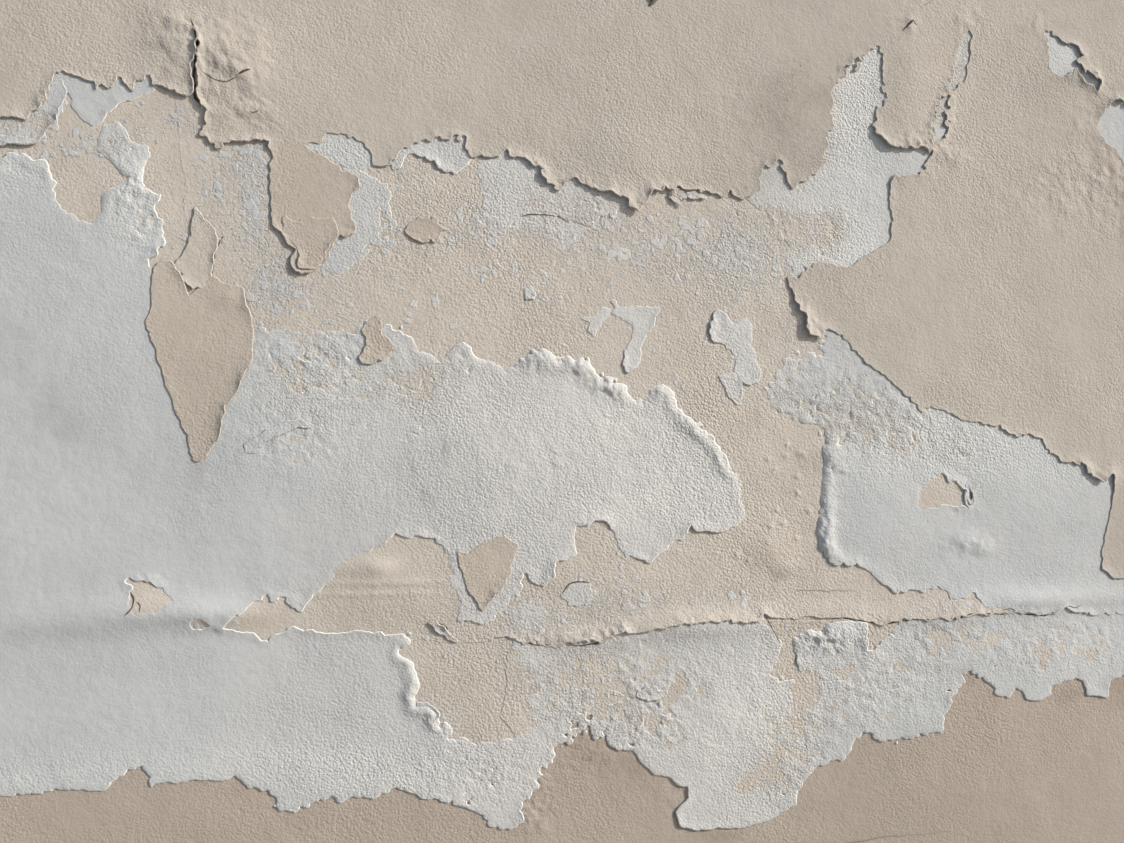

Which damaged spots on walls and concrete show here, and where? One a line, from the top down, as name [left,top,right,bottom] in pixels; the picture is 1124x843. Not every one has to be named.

crack [190,18,250,107]
peeling [1045,31,1124,180]
peeling [917,473,967,510]
peeling [126,578,171,615]
peeling [499,647,540,738]
crack [527,639,606,647]
peeling [553,652,618,698]
peeling [586,675,632,722]
peeling [792,617,968,776]
peeling [965,608,1124,701]
peeling [644,714,663,737]
peeling [735,743,808,794]